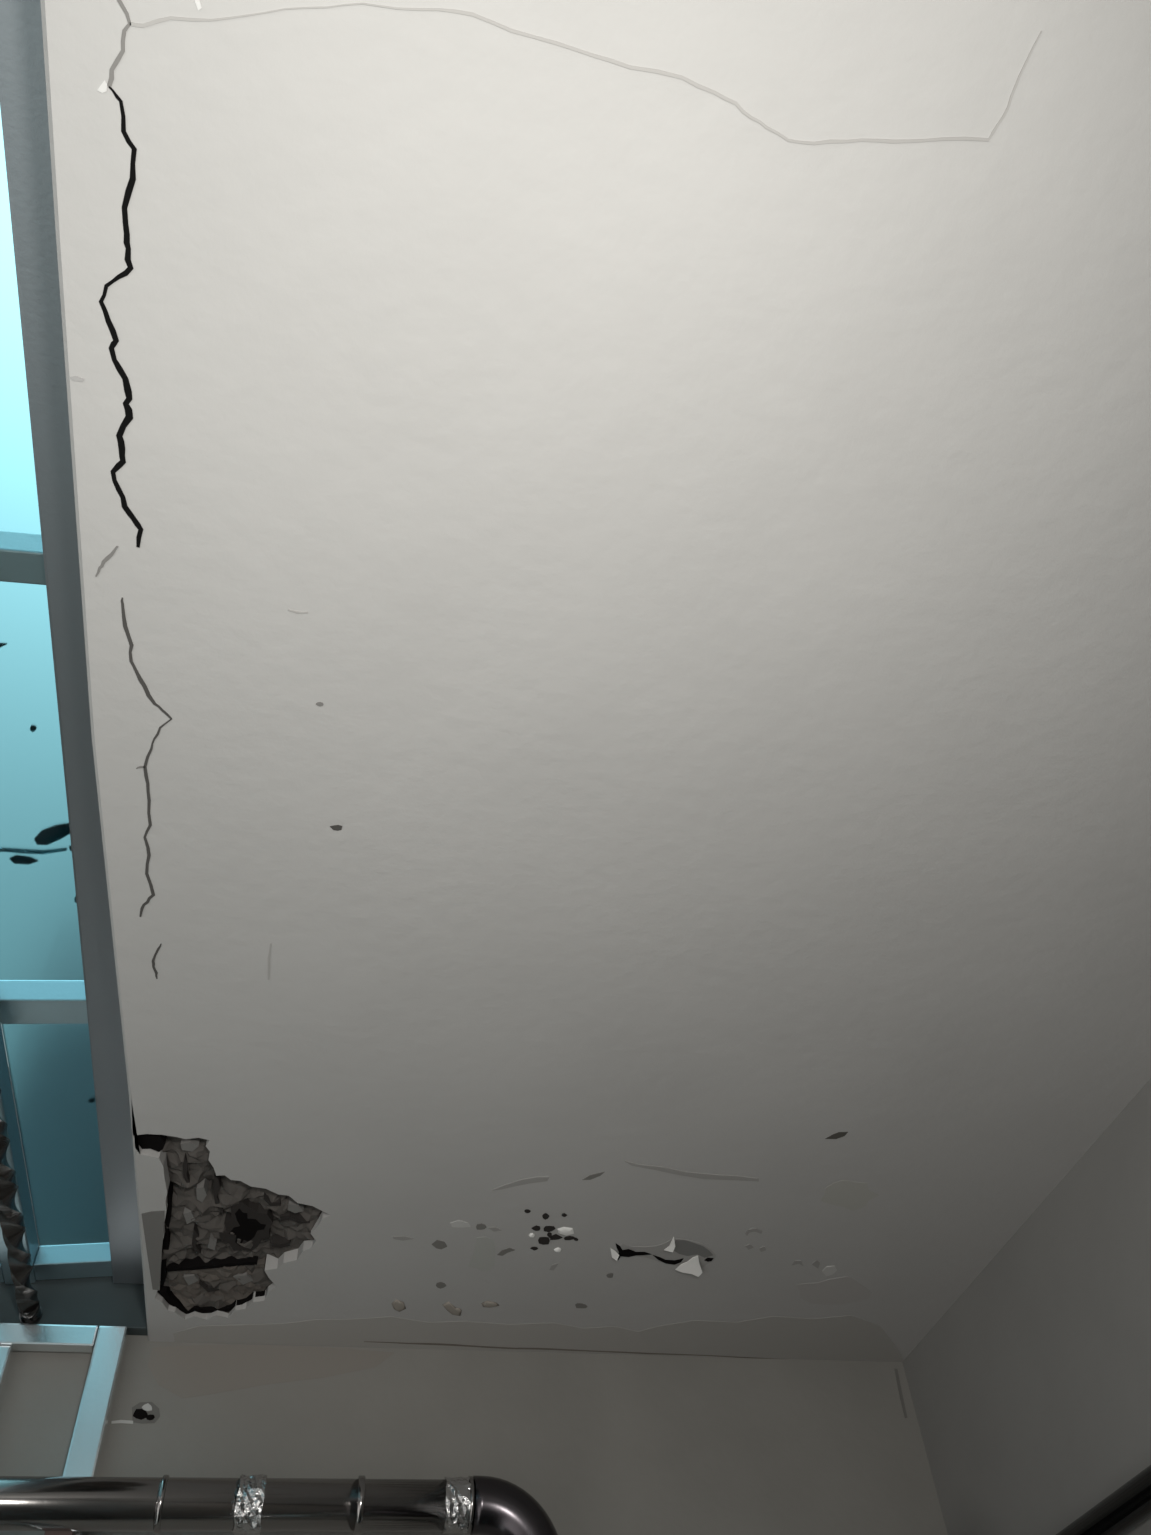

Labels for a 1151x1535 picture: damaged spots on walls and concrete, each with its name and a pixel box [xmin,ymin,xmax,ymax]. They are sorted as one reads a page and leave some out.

crack [96,0,1043,980]
spalling [137,1134,322,1314]
spalling [497,1209,578,1271]
peeling [606,1237,716,1278]